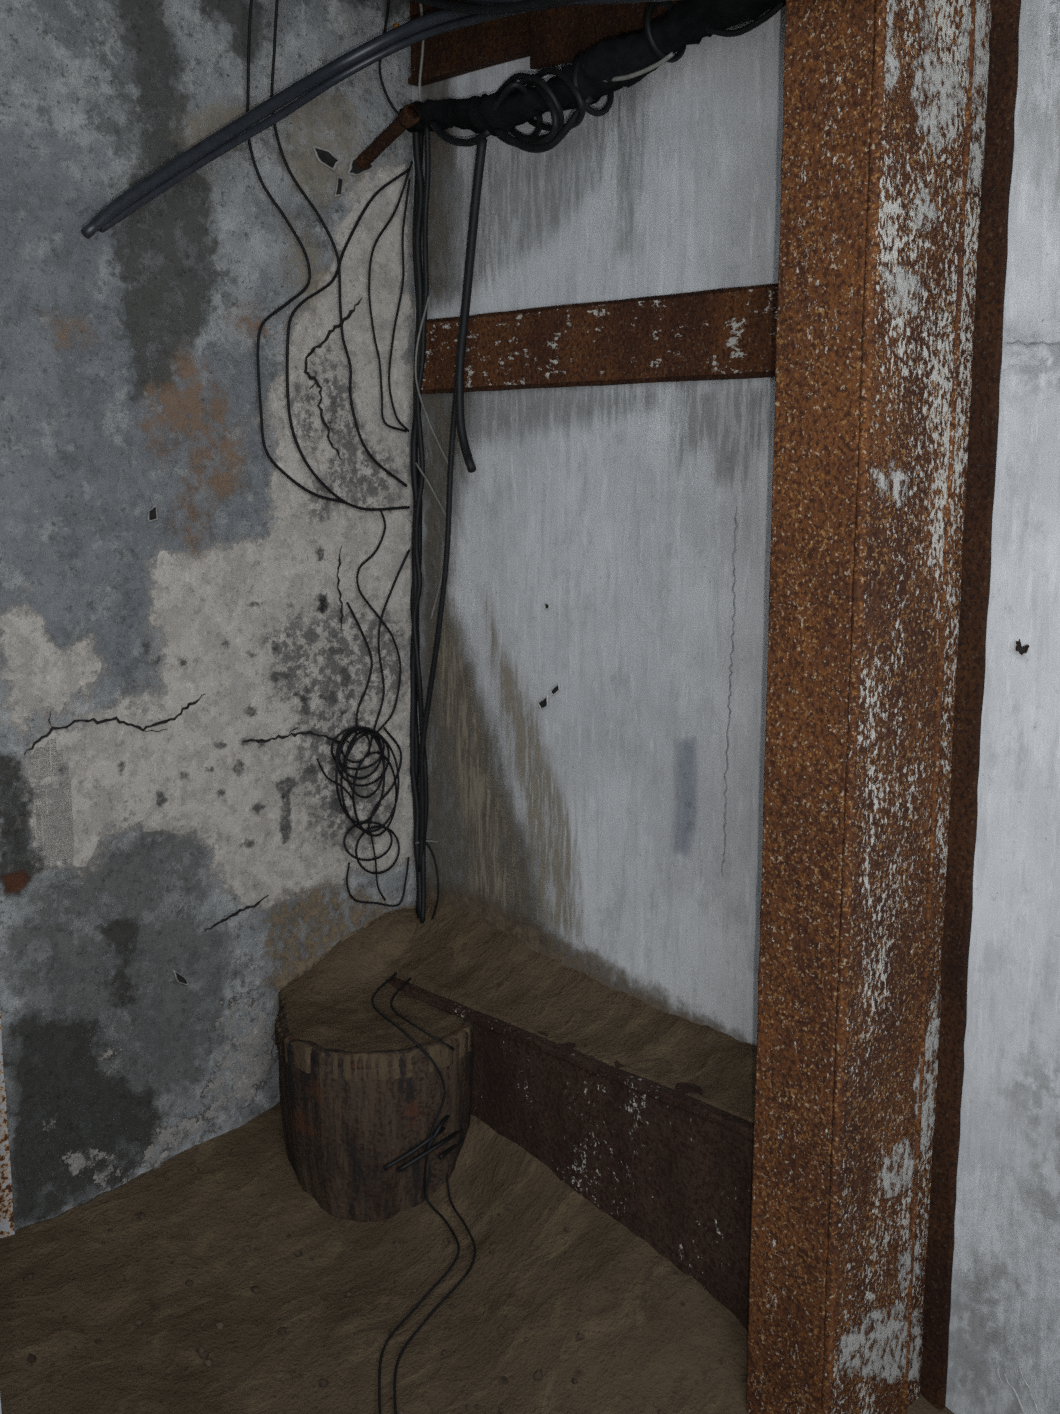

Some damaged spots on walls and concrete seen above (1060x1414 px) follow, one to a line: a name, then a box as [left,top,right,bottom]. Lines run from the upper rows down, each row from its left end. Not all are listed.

water stain [117,0,243,187]
water stain [200,0,266,63]
water stain [421,79,452,102]
water stain [421,84,636,300]
water stain [112,173,218,400]
mould [290,348,397,517]
corrosion [3,870,29,893]
crack [24,694,206,755]
water stain [0,388,746,1229]